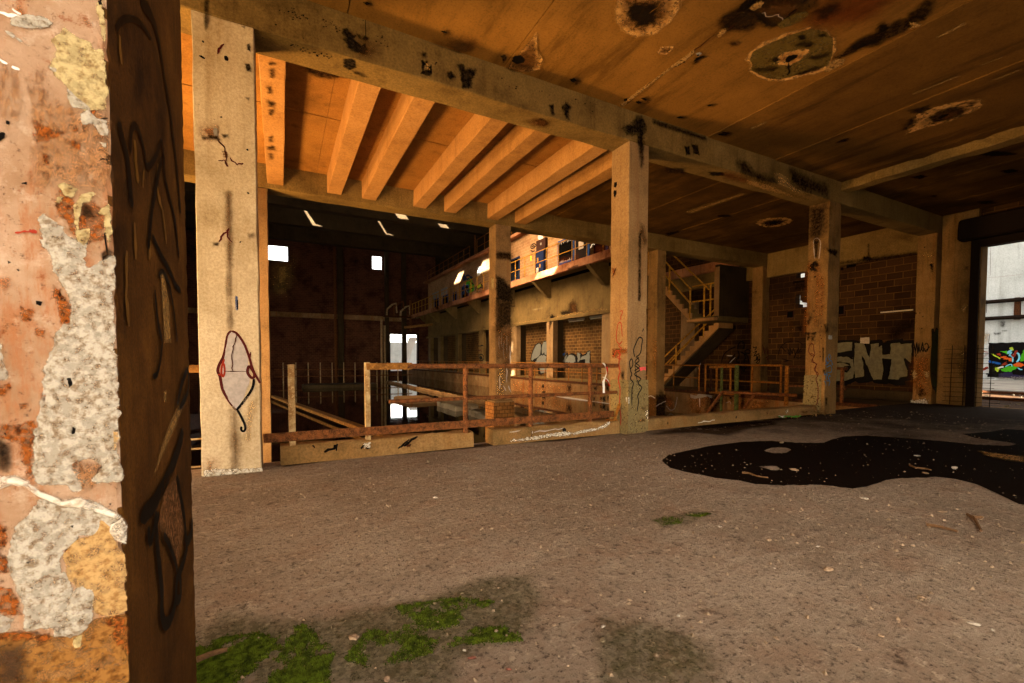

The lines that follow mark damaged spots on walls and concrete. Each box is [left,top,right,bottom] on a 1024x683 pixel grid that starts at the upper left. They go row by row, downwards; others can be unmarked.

peeling [48,2,109,160]
leakage [746,27,836,81]
peeling [0,214,129,683]